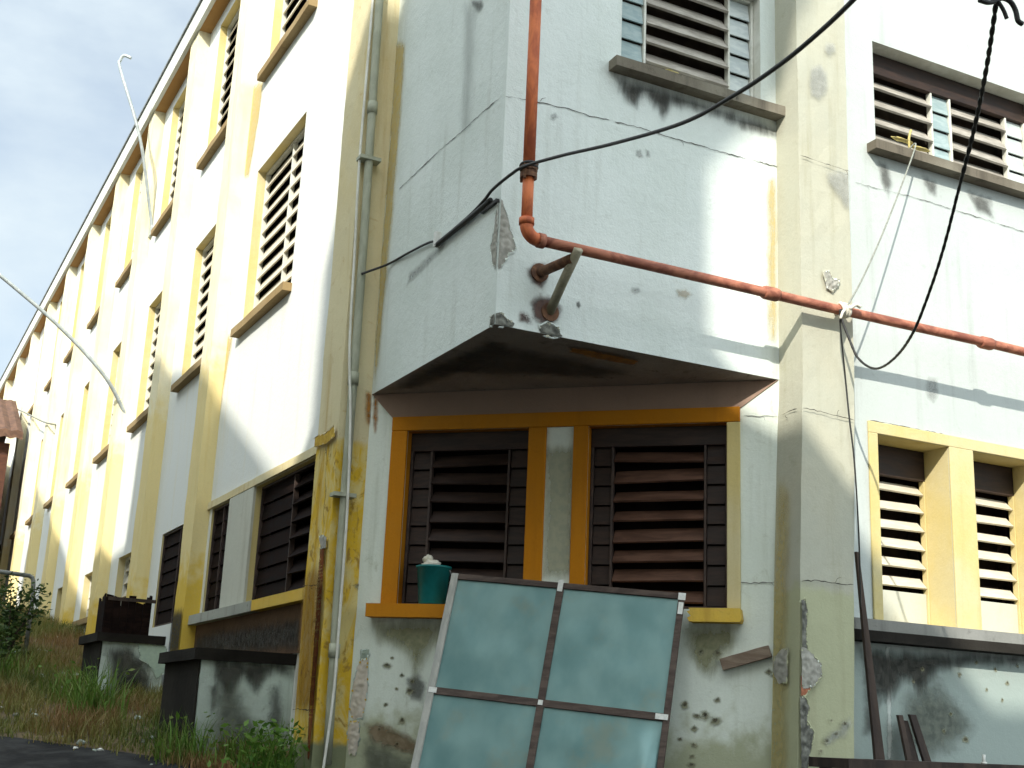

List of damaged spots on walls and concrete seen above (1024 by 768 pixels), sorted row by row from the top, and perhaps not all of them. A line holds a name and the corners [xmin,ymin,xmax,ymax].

crack [399,96,777,189]
water stain [623,81,774,134]
flaking render [490,199,517,269]
water stain [974,197,990,212]
flaking render [489,311,514,328]
corrosion [520,269,559,323]
flaking render [538,321,562,339]
water stain [111,649,149,695]
water stain [195,622,299,750]
flaking render [346,649,370,756]
flaking render [765,598,848,768]
water stain [872,647,990,759]